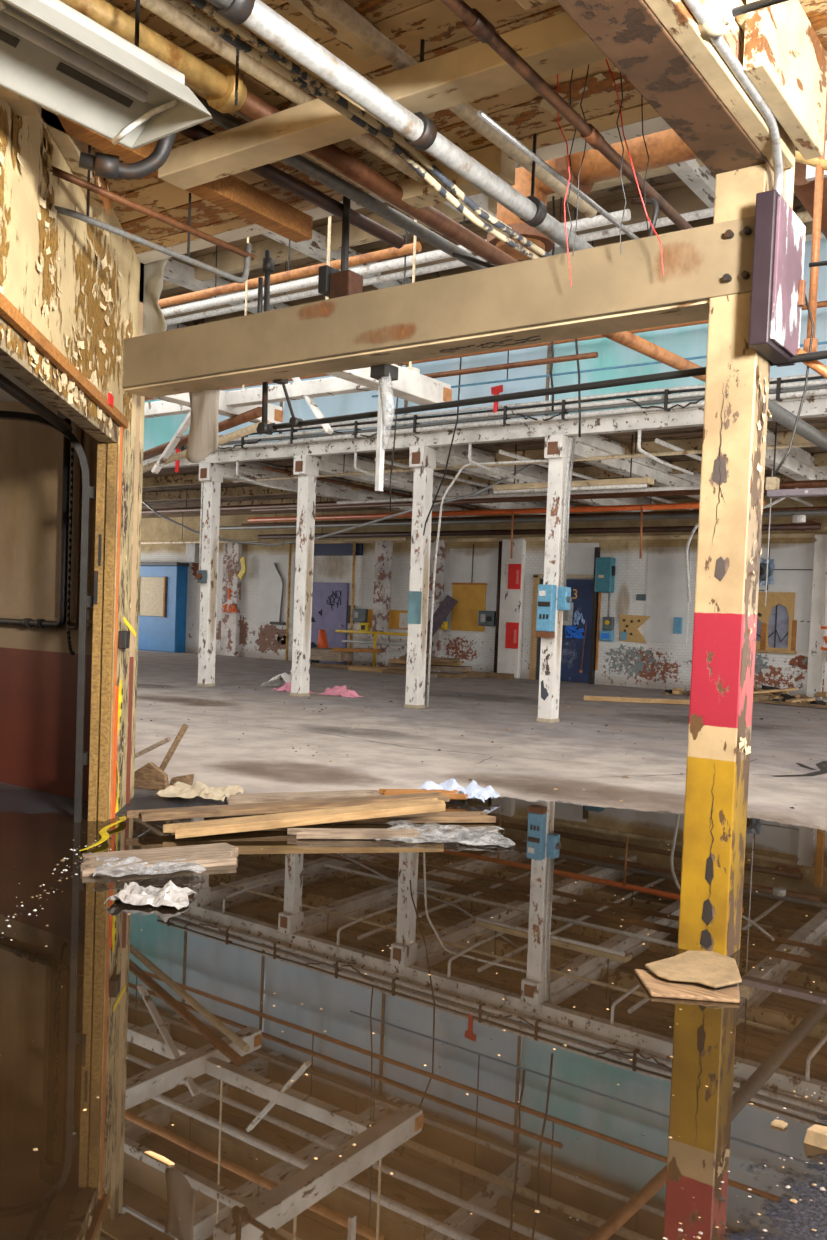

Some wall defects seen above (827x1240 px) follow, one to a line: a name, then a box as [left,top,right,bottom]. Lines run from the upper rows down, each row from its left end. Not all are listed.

peeling [0,107,134,437]
spalling [722,364,740,435]
peeling [755,374,772,472]
peeling [709,450,729,489]
peeling [189,514,236,588]
spalling [239,615,302,673]
peeling [598,643,684,686]
peeling [754,654,808,689]
peeling [739,737,751,755]
crack [750,758,827,777]
crack [706,765,715,926]
spalling [699,853,715,951]